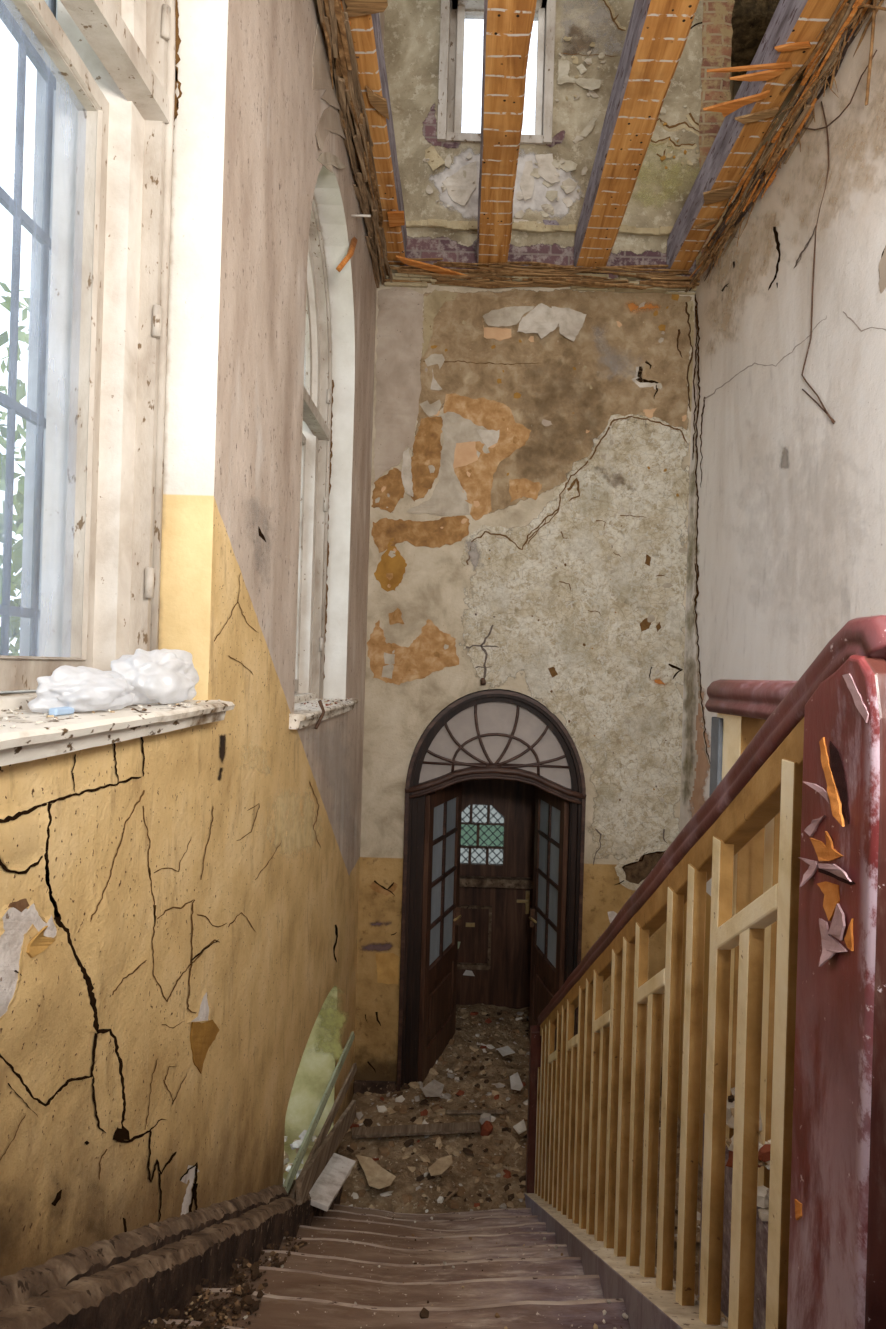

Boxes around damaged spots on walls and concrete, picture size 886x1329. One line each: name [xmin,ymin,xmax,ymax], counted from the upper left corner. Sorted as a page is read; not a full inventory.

flaking render [314,0,884,524]
crack [768,225,816,290]
flaking render [640,615,661,632]
crack [309,782,321,848]
flaking render [0,898,58,1021]
crack [0,737,282,1222]
flaking render [187,988,219,1074]